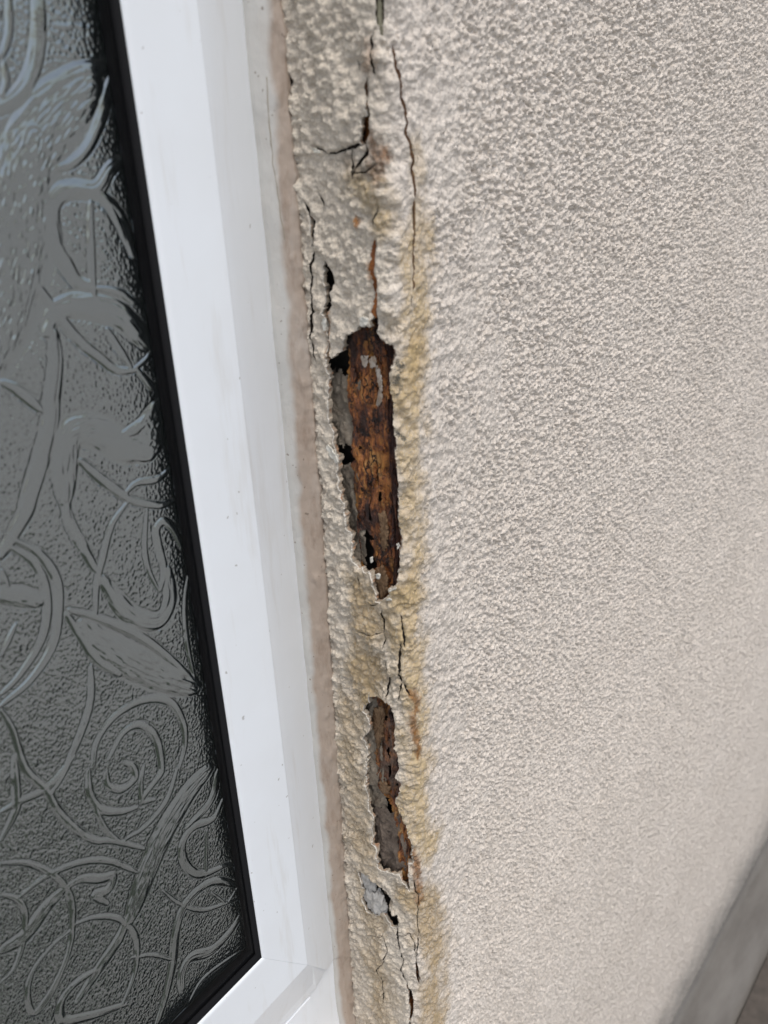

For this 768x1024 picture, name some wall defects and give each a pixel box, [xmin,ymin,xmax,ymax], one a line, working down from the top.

crack [266,33,417,361]
flaking render [321,261,407,604]
crack [357,577,410,700]
flaking render [358,692,414,928]
crack [370,882,421,1024]
corrosion [372,445,443,1024]